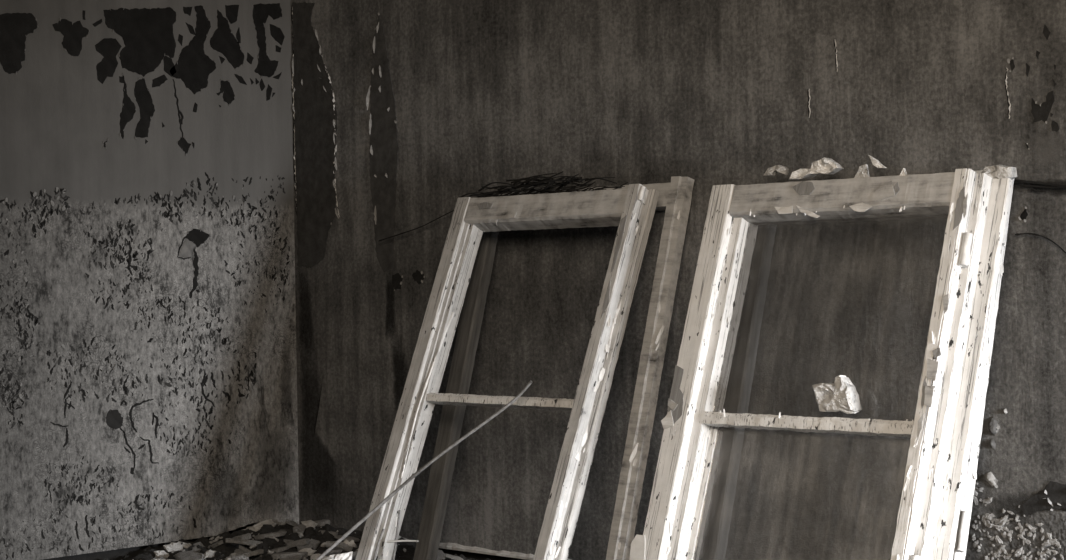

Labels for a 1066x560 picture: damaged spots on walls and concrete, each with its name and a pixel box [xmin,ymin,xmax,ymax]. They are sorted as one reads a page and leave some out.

spalling [1007,50,1040,77]
spalling [1031,65,1060,132]
spalling [0,2,339,457]
flaking render [972,469,1066,560]
flaking render [439,542,534,560]